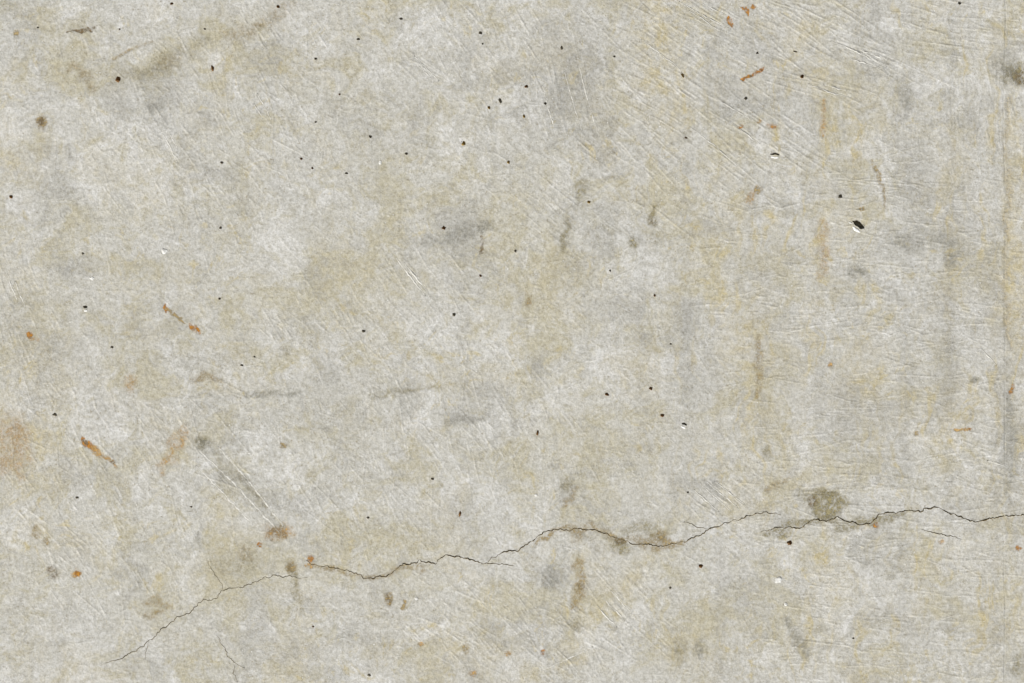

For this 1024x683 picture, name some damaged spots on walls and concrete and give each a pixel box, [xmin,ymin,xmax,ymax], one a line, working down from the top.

corrosion [81,437,116,466]
water stain [809,489,849,519]
crack [105,506,1024,664]
crack [216,635,244,681]